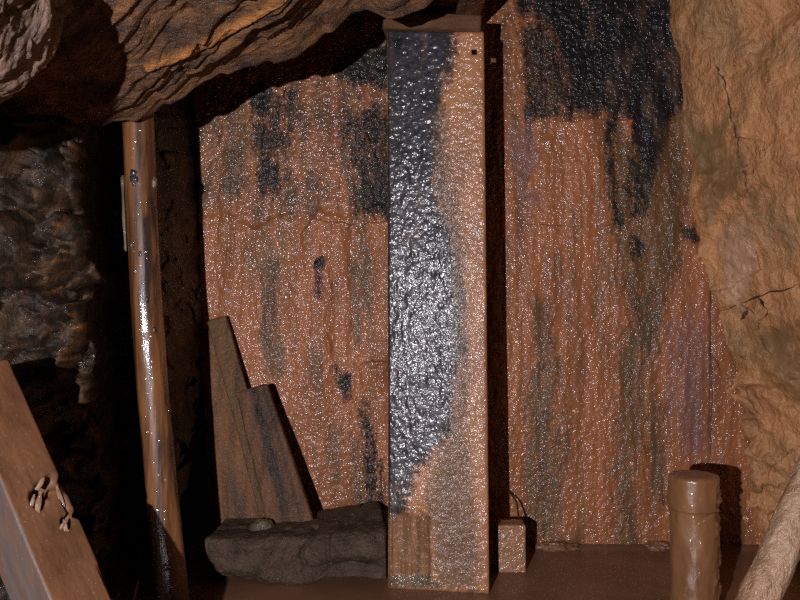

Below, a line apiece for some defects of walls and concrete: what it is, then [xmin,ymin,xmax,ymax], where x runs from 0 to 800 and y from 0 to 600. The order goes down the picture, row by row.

damp [224,76,301,204]
crack [714,60,747,199]
damp [332,31,467,524]
damp [516,0,700,545]
crack [710,284,797,461]